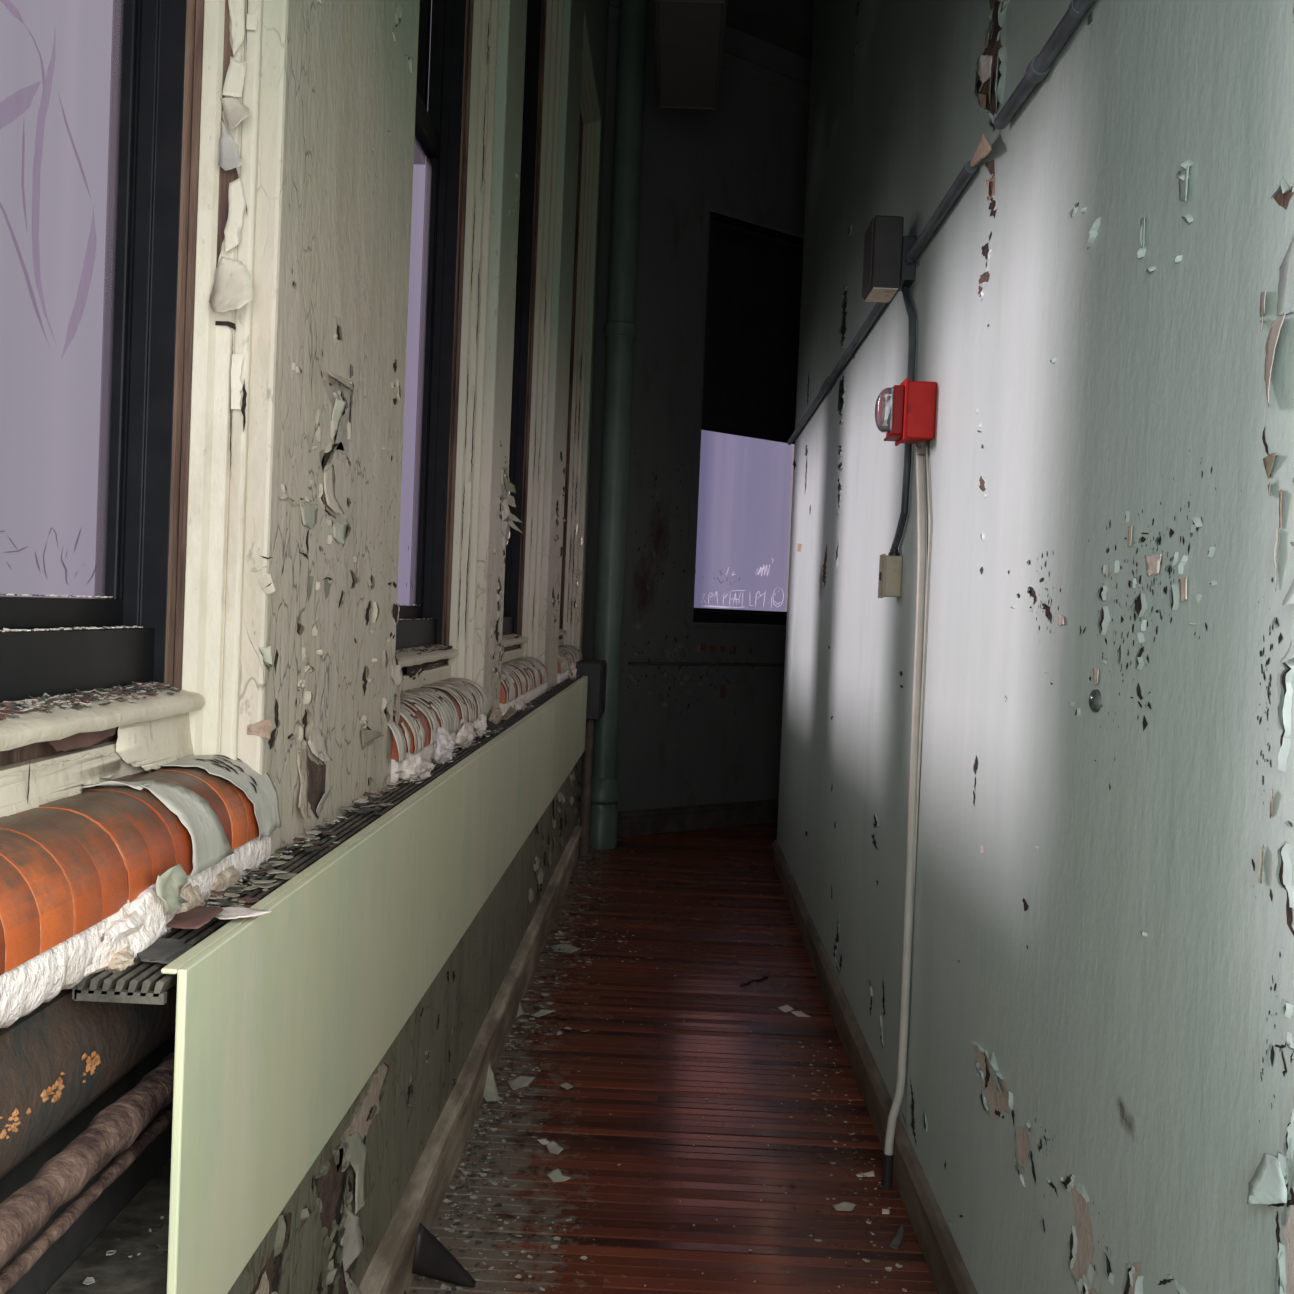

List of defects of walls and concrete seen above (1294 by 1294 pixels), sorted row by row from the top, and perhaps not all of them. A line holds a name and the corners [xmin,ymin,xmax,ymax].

peeling [209,0,257,469]
spalling [970,133,993,167]
peeling [310,316,354,550]
peeling [360,427,583,764]
peeling [1013,542,1064,633]
peeling [1080,493,1217,731]
peeling [268,648,334,822]
rust [0,1072,65,1139]
rust [81,1051,101,1083]
peeling [300,1060,390,1294]
peeling [972,1040,1144,1294]
peeling [1278,1143,1294,1294]